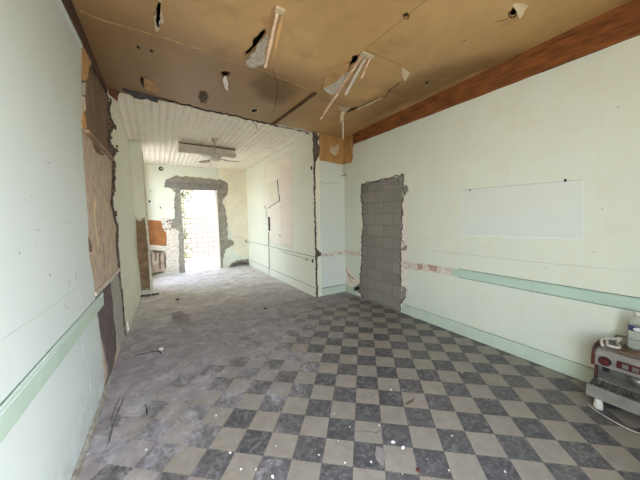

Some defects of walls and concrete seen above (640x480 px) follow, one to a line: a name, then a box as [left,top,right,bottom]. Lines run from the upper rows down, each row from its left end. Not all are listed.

peeling [246,15,271,68]
spalling [122,77,159,103]
spalling [107,98,126,347]
flaking render [161,218,172,232]
flaking render [272,124,453,309]